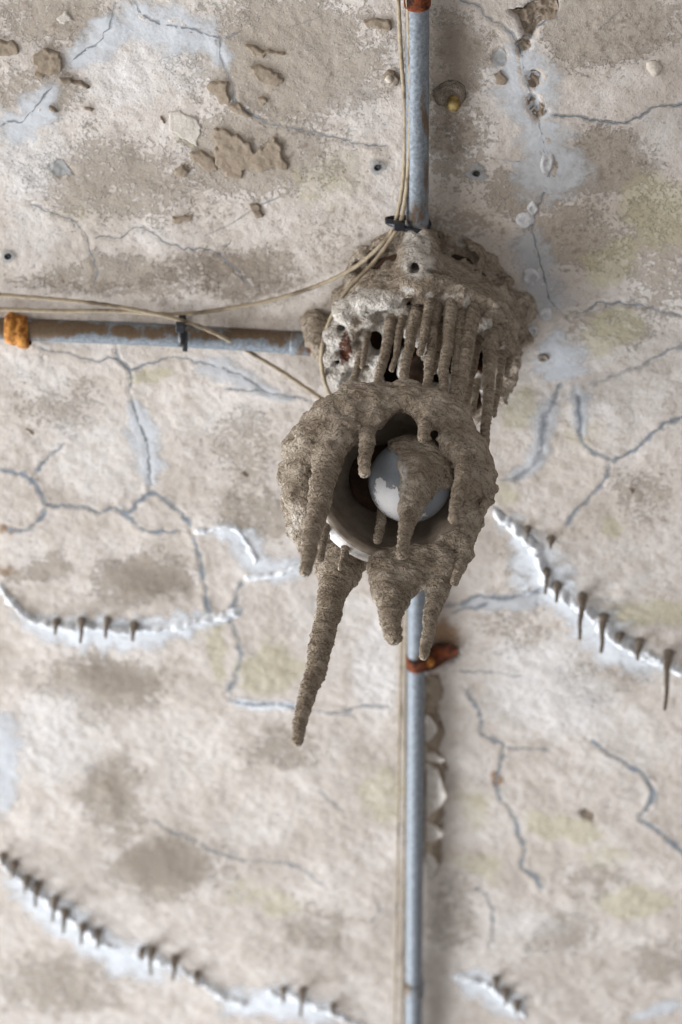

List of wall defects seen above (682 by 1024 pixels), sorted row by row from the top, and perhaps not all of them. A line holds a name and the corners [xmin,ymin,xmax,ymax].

spalling [32,47,90,89]
crack [70,2,240,66]
spalling [245,44,285,106]
spalling [492,0,558,85]
spalling [160,110,289,179]
crack [555,384,682,525]
crack [0,348,307,710]
efflorescence [0,582,243,654]
efflorescence [464,509,682,711]
crack [468,697,545,890]
crack [590,740,682,854]
efflorescence [0,852,365,1024]